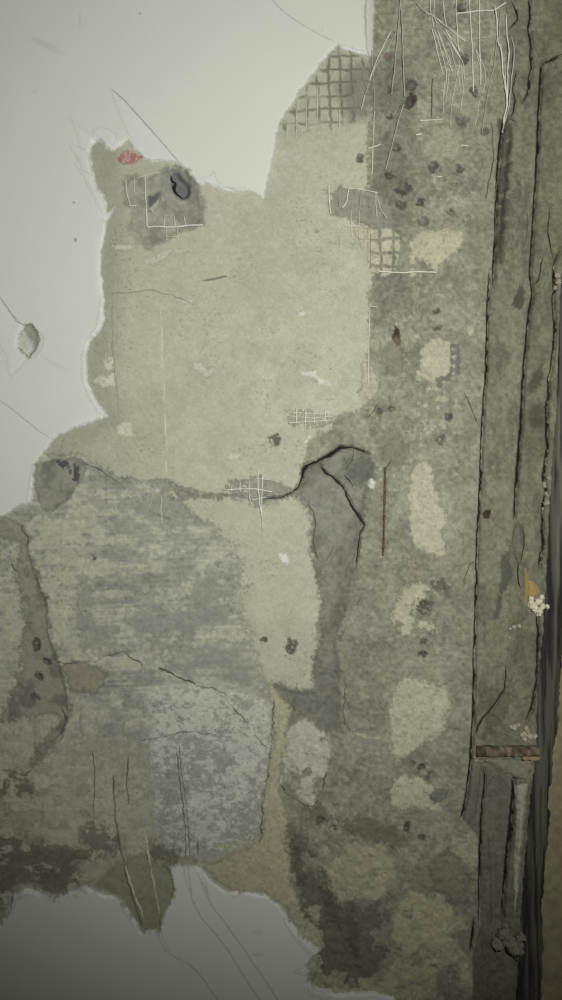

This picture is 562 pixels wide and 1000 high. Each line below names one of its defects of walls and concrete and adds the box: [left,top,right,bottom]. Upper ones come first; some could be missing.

peeling [0,0,393,1000]
crack [265,446,367,563]
crack [461,0,562,950]
crack [125,652,327,807]
damp [305,802,403,849]
corrosion [476,745,540,758]
damp [290,831,387,985]